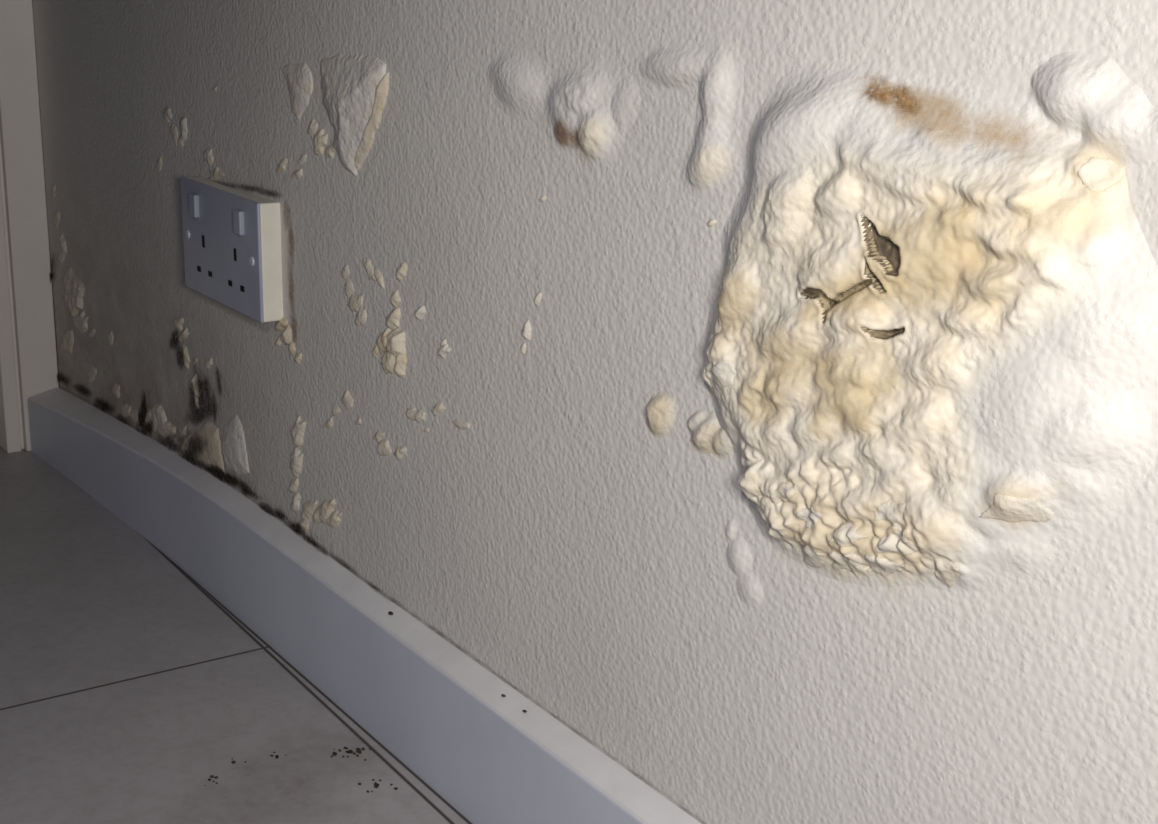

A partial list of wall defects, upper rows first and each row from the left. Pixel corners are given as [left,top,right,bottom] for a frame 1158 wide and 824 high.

peeling [277,54,389,181]
crack [800,215,901,323]
damp [170,332,183,367]
peeling [275,317,302,364]
peeling [363,257,408,378]
peeling [521,320,531,354]
crack [861,327,905,340]
damp [57,373,152,434]
damp [189,370,221,423]
damp [166,438,326,554]
peeling [289,416,342,534]